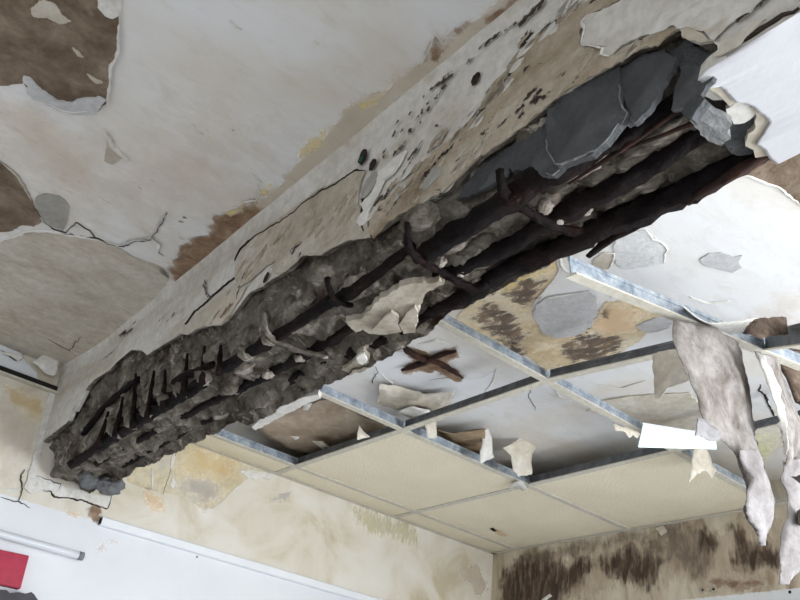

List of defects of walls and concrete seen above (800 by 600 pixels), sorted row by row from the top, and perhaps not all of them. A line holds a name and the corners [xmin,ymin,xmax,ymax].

peeling [23,0,122,116]
leakage [478,0,565,49]
leakage [167,0,518,281]
peeling [0,161,170,364]
crack [40,213,167,247]
crack [185,169,365,325]
spalling [49,0,800,509]
leakage [502,263,553,305]
leakage [472,294,527,356]
leakage [561,334,623,363]
crack [0,470,113,510]
leakage [501,521,781,600]